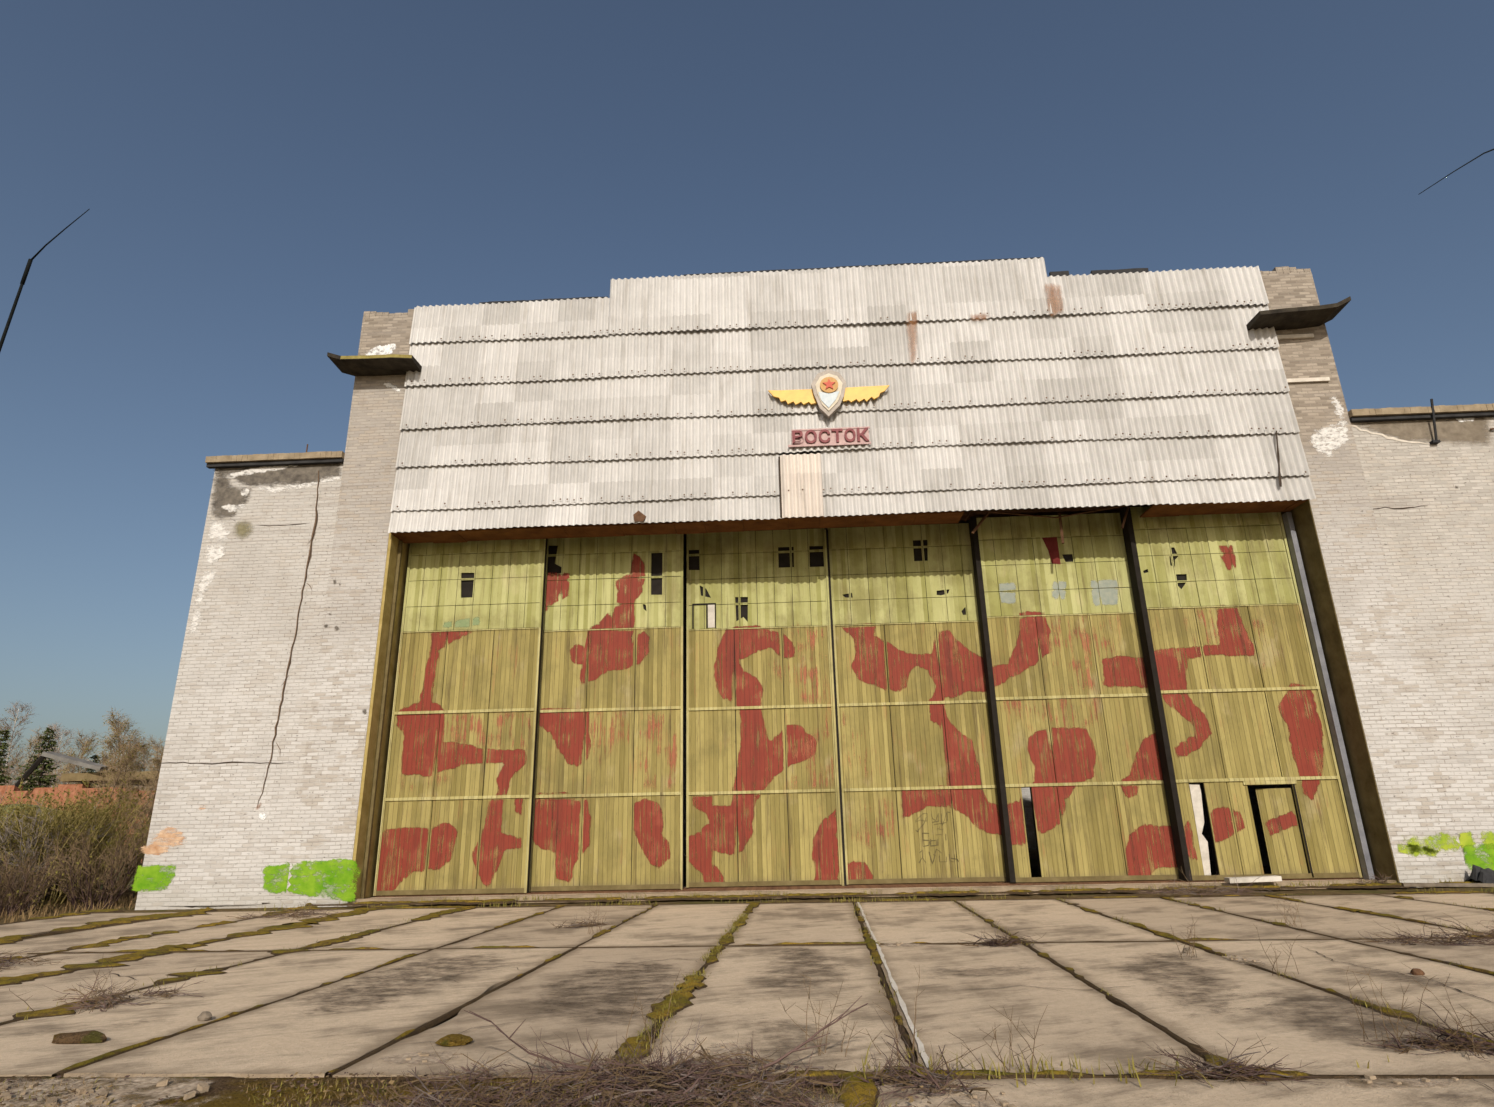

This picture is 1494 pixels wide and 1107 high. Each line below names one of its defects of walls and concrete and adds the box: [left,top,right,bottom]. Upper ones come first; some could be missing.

peeling [1311,397,1349,457]
leakage [212,464,340,517]
crack [157,471,319,807]